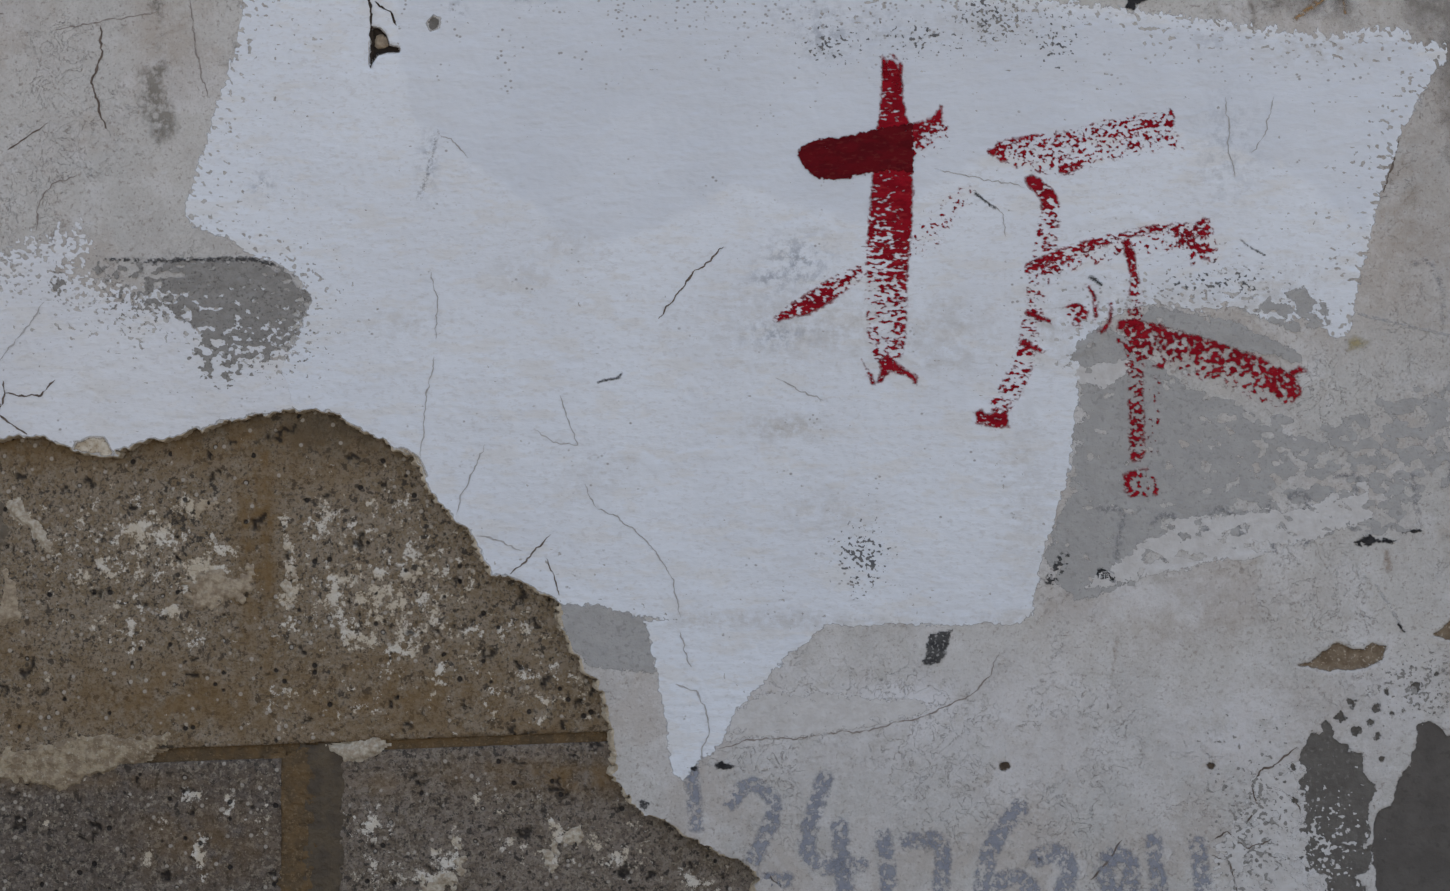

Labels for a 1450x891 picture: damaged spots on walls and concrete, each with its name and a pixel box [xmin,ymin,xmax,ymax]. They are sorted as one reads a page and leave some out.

crack [58,12,156,129]
crack [190,3,208,95]
crack [368,0,397,68]
crack [0,302,55,434]
peeling [1140,260,1331,363]
peeling [1043,327,1450,601]
peeling [833,517,898,600]
spalling [0,409,783,891]
peeling [1187,621,1450,891]